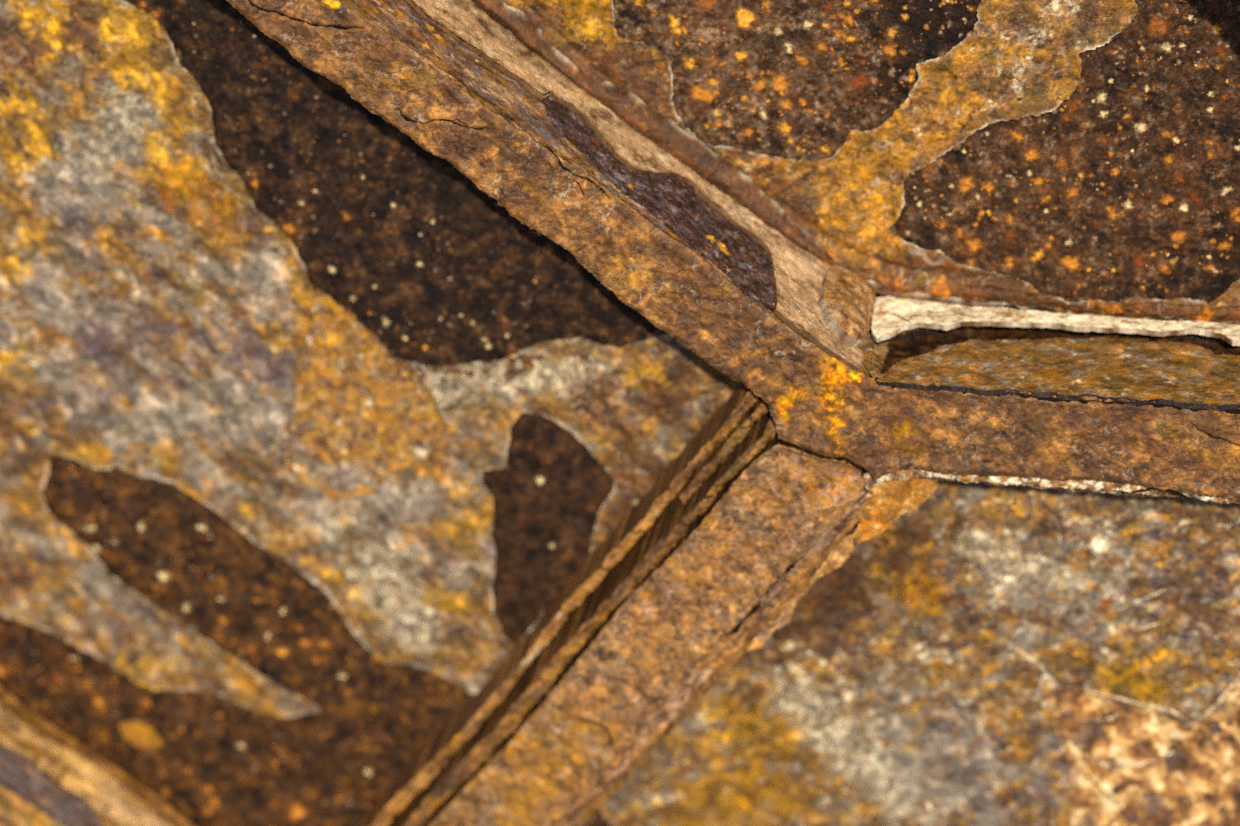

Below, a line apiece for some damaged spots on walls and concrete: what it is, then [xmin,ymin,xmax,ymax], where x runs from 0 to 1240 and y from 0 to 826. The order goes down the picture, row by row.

peeling [0,455,474,826]
corrosion [0,0,741,718]
peeling [127,0,676,501]
peeling [482,413,614,644]
peeling [352,0,775,312]
peeling [600,0,981,181]
corrosion [775,358,860,455]
corrosion [503,0,1240,324]
corrosion [580,480,1240,826]
peeling [870,0,1240,374]
crack [962,392,1240,445]
crack [1109,488,1194,503]